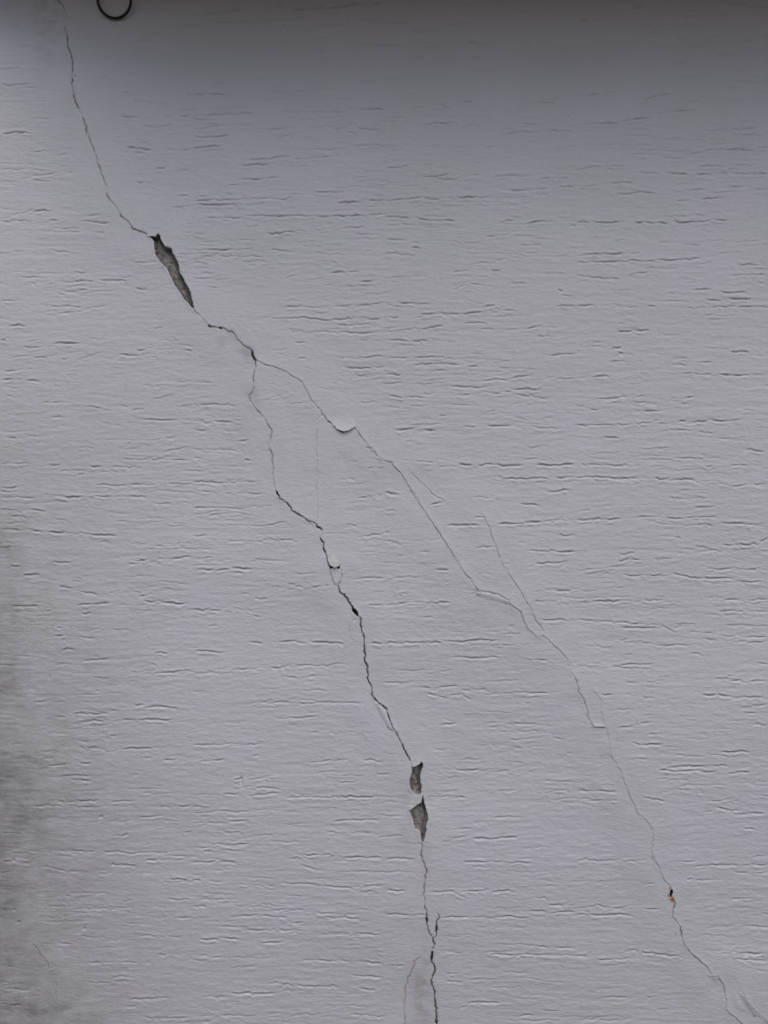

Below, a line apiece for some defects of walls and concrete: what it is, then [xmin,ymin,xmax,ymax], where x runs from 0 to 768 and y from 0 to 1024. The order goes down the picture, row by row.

crack [59,1,146,234]
flaking render [146,234,194,309]
crack [194,310,608,760]
flaking render [408,759,430,842]
crack [403,842,440,1024]